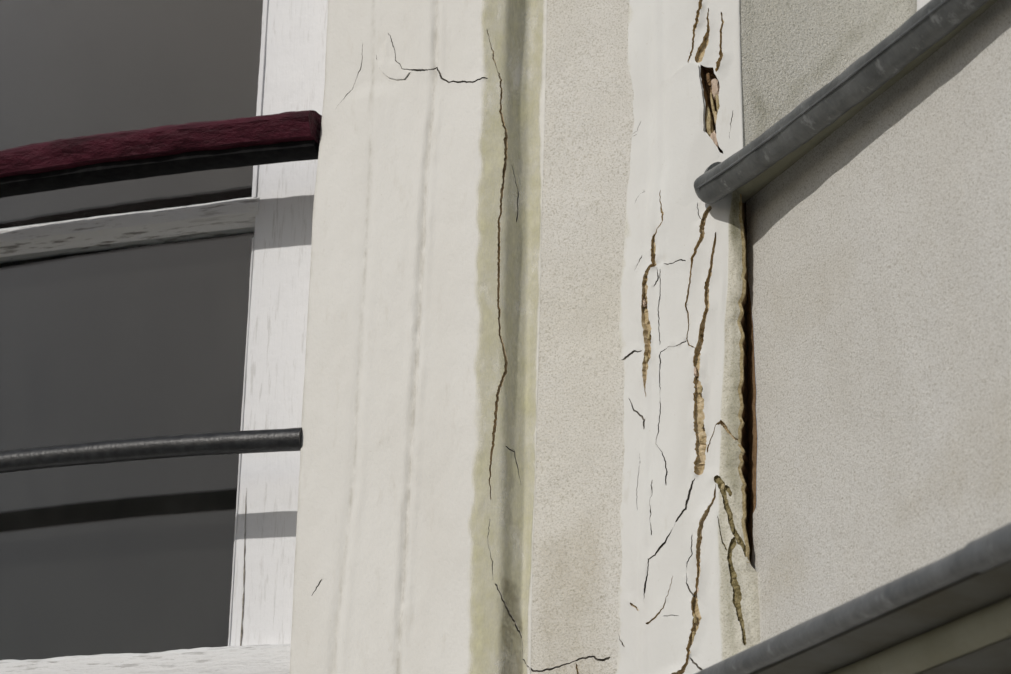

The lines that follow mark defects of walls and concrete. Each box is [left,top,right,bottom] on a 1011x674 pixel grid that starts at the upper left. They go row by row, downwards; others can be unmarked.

crack [687,0,724,72]
spalling [700,64,723,154]
crack [336,30,625,674]
crack [622,190,757,674]